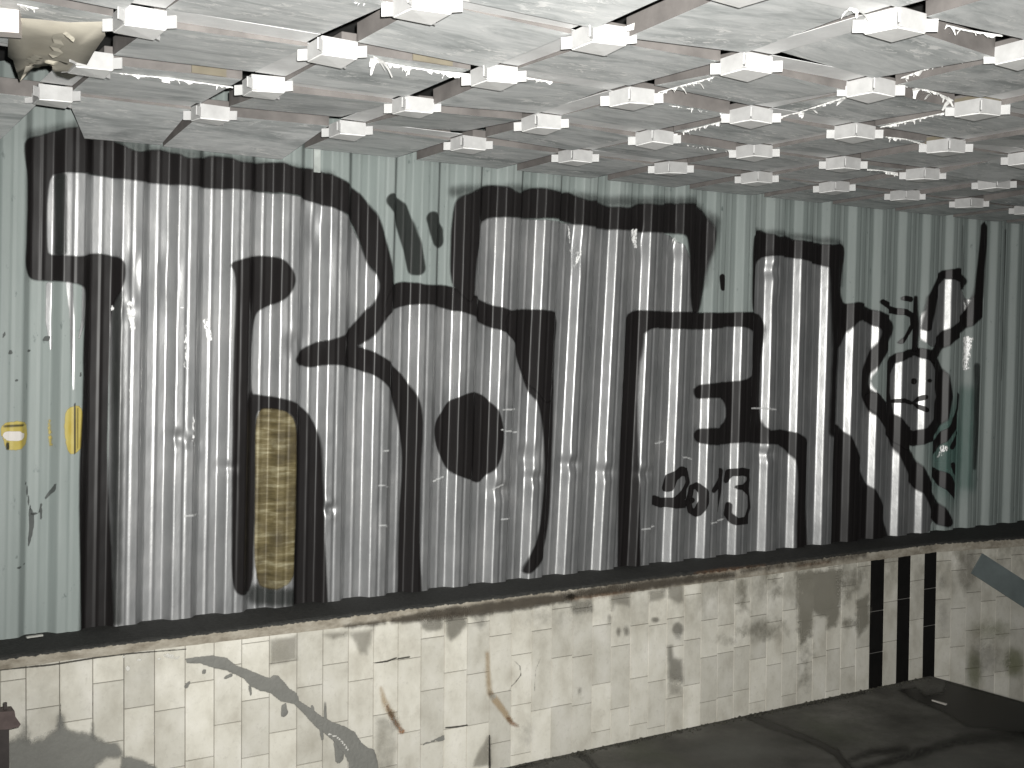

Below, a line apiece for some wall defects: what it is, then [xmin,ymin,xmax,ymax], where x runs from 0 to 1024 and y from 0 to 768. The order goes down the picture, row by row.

damp [797,570,868,643]